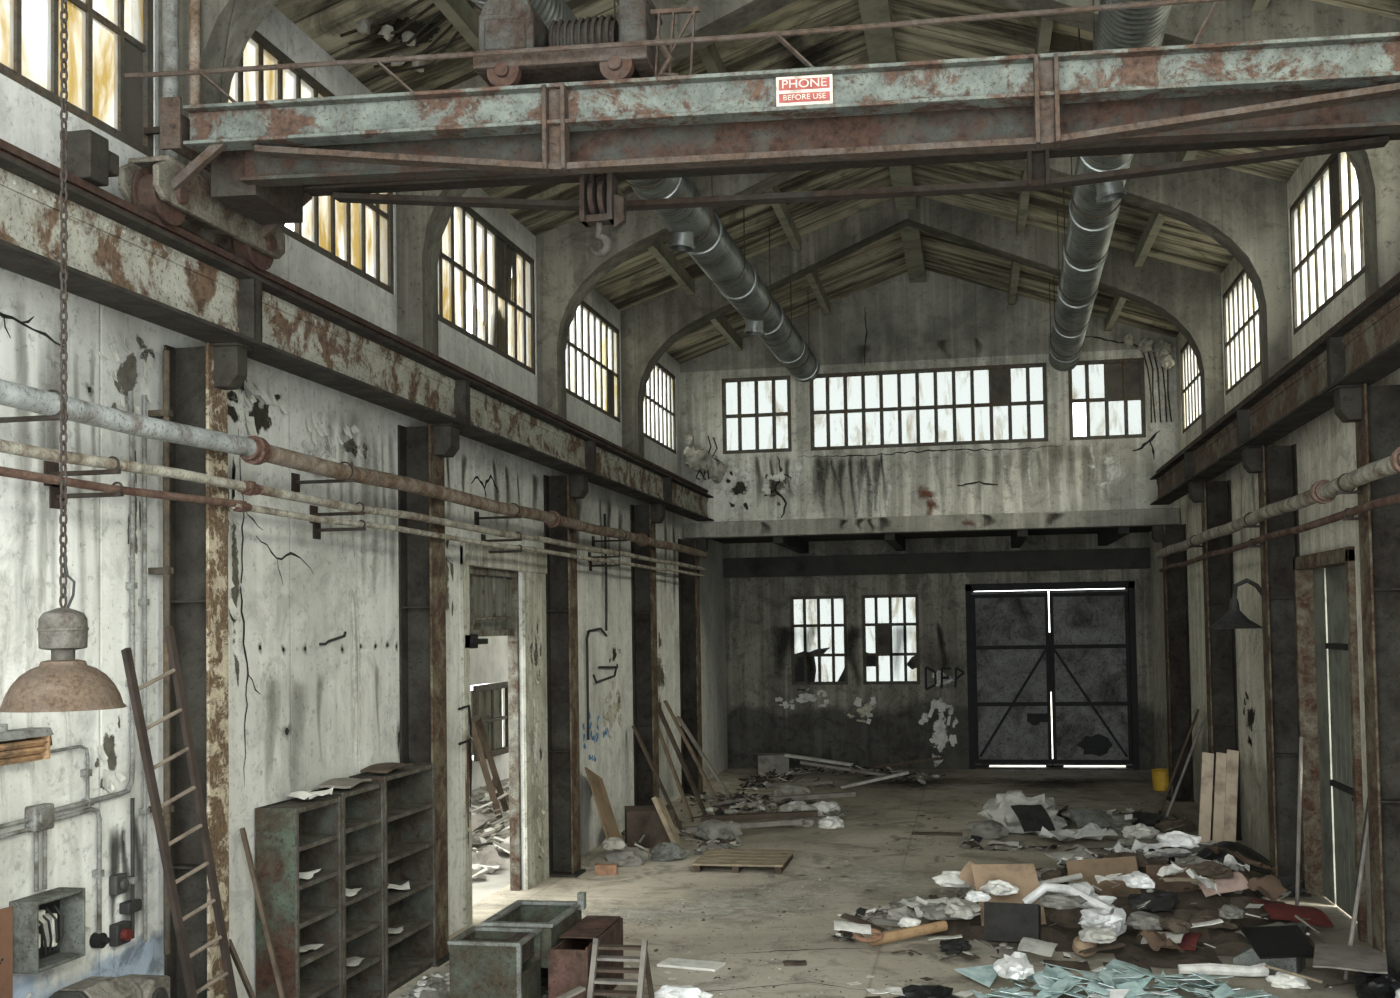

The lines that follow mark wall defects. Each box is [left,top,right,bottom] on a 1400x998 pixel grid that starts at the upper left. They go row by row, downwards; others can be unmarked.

crack [0,312,64,348]
leakage [745,456,892,529]
crack [238,429,313,788]